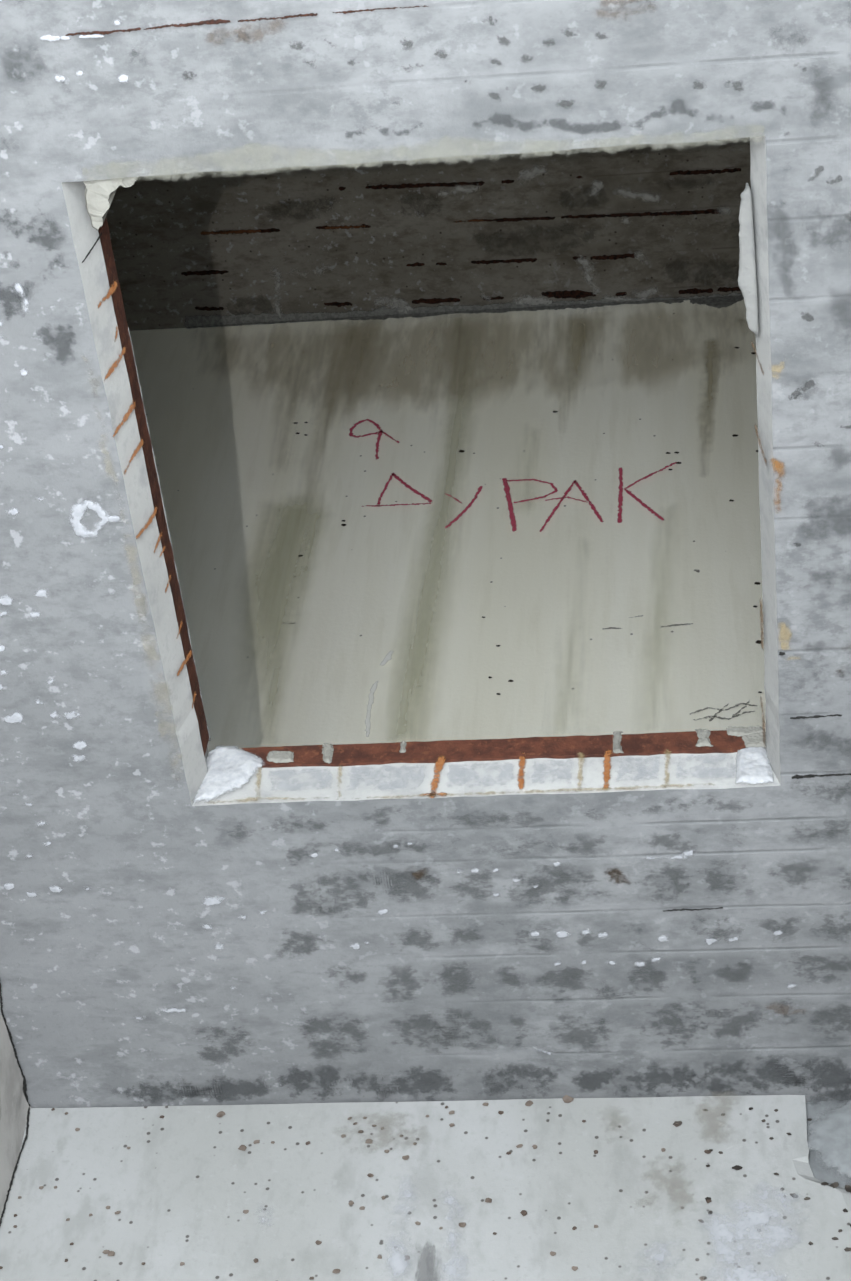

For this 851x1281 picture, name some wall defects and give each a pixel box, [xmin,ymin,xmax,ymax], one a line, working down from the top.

crack [65,5,428,36]
corrosion [98,281,117,308]
spalling [184,292,744,329]
corrosion [105,327,126,379]
corrosion [113,401,136,437]
corrosion [124,439,143,474]
corrosion [755,425,783,503]
corrosion [136,507,165,557]
corrosion [421,756,453,798]
corrosion [518,750,690,793]
leakage [389,1197,462,1281]